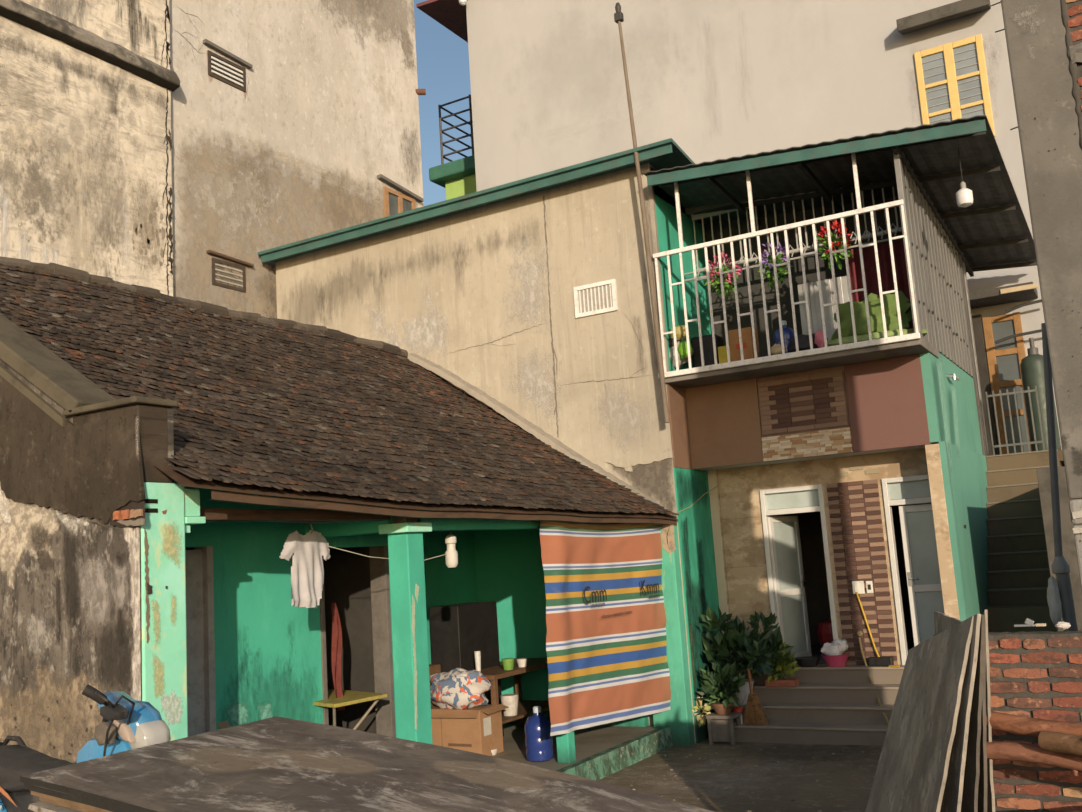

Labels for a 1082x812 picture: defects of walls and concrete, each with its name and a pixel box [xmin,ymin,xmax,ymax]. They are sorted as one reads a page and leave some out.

water stain [118,0,156,48]
crack [161,0,204,295]
water stain [175,134,409,318]
crack [453,196,658,438]
flaking render [0,489,59,588]
peeling [28,615,50,653]
water stain [32,528,51,569]
water stain [0,606,132,764]
water stain [56,511,89,639]
peeling [81,490,176,701]
peeling [154,657,183,725]
peeling [162,510,181,566]